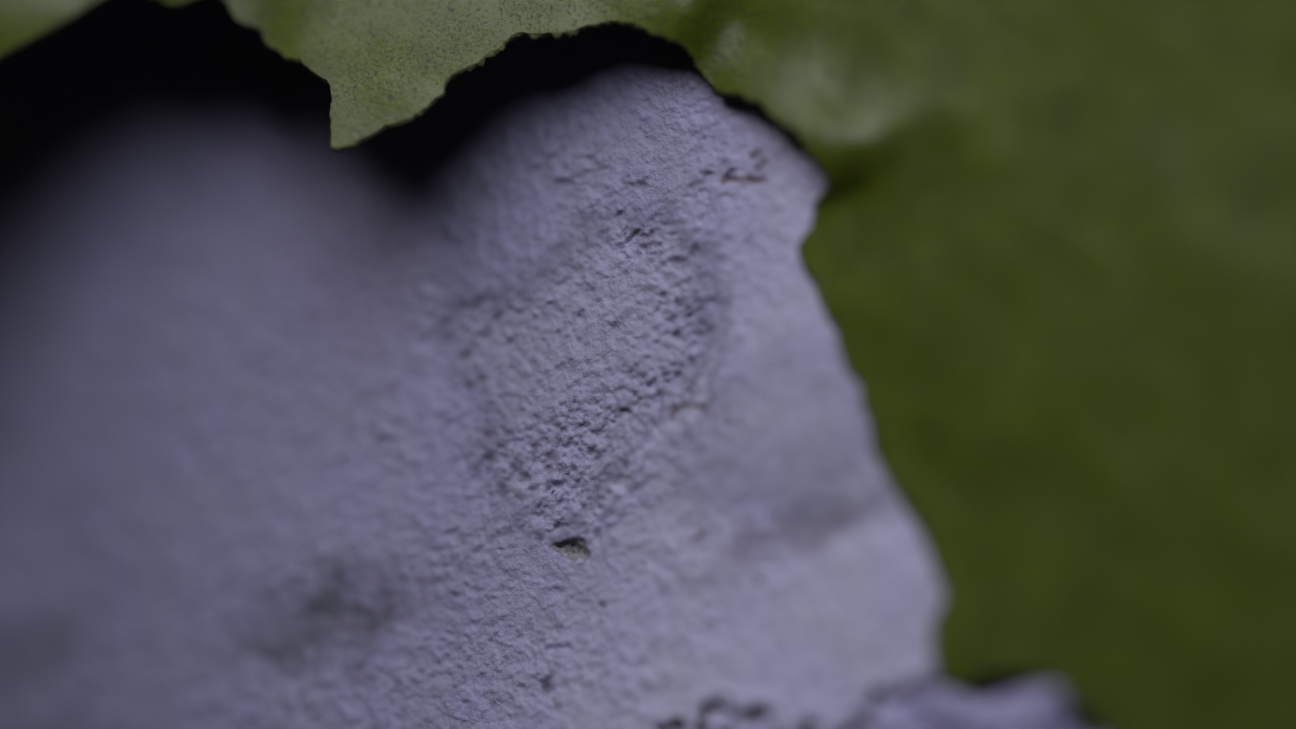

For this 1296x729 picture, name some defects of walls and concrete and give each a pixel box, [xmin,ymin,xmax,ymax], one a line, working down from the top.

peeling [0,0,100,58]
peeling [225,0,954,237]
flaking render [440,213,727,564]
peeling [797,0,1296,729]